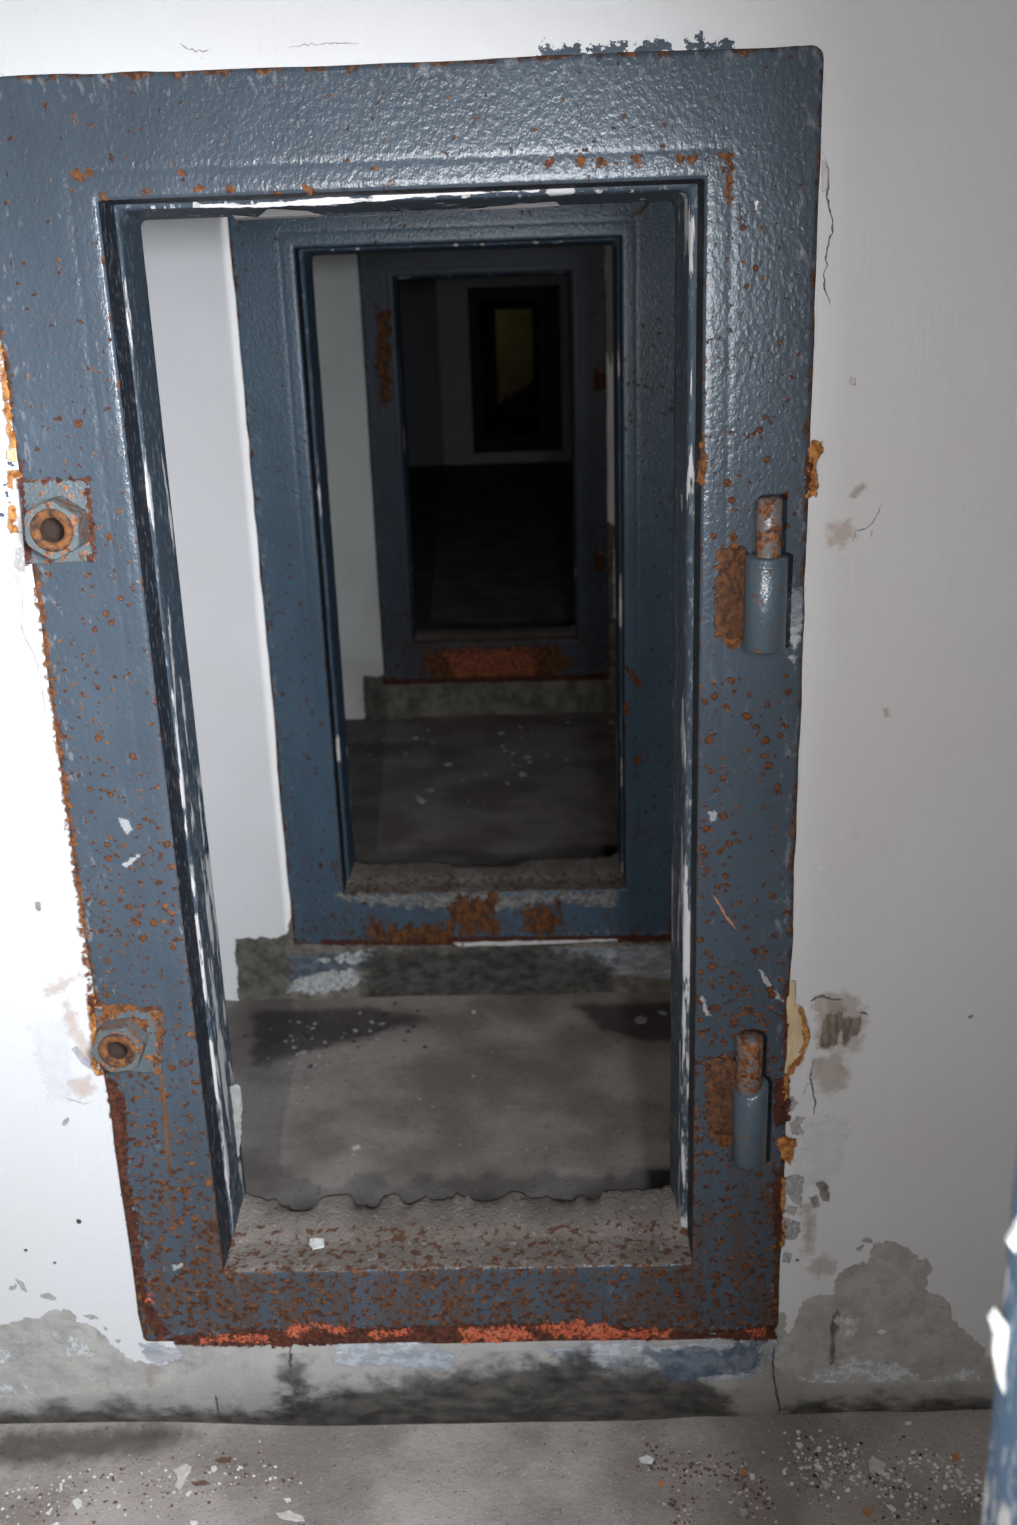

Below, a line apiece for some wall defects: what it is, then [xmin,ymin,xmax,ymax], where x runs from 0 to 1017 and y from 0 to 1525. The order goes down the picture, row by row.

rust [373,301,394,410]
rust [781,440,824,529]
rust [0,344,796,1349]
peeling [781,981,810,1075]
spalling [783,1174,830,1263]
peeling [1005,1218,1017,1253]
peeling [777,1237,1008,1395]